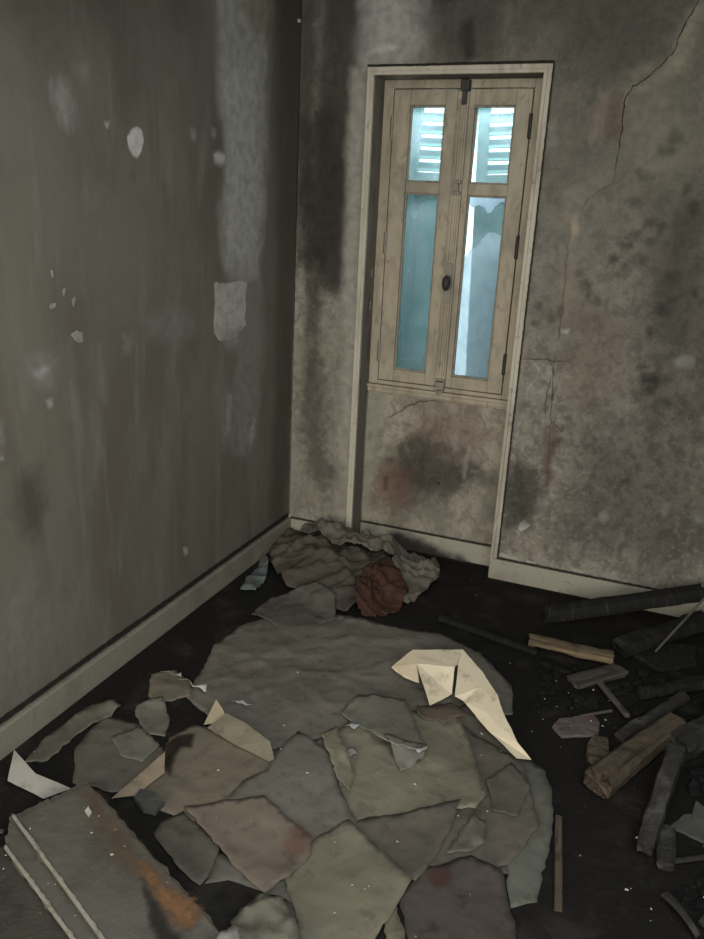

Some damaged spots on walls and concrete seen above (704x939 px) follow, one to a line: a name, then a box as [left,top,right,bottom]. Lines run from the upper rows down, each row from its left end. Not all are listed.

flaking render [127,126,144,158]
water stain [213,0,267,341]
crack [361,0,699,590]
peeling [71,330,83,343]
water stain [400,438,475,491]